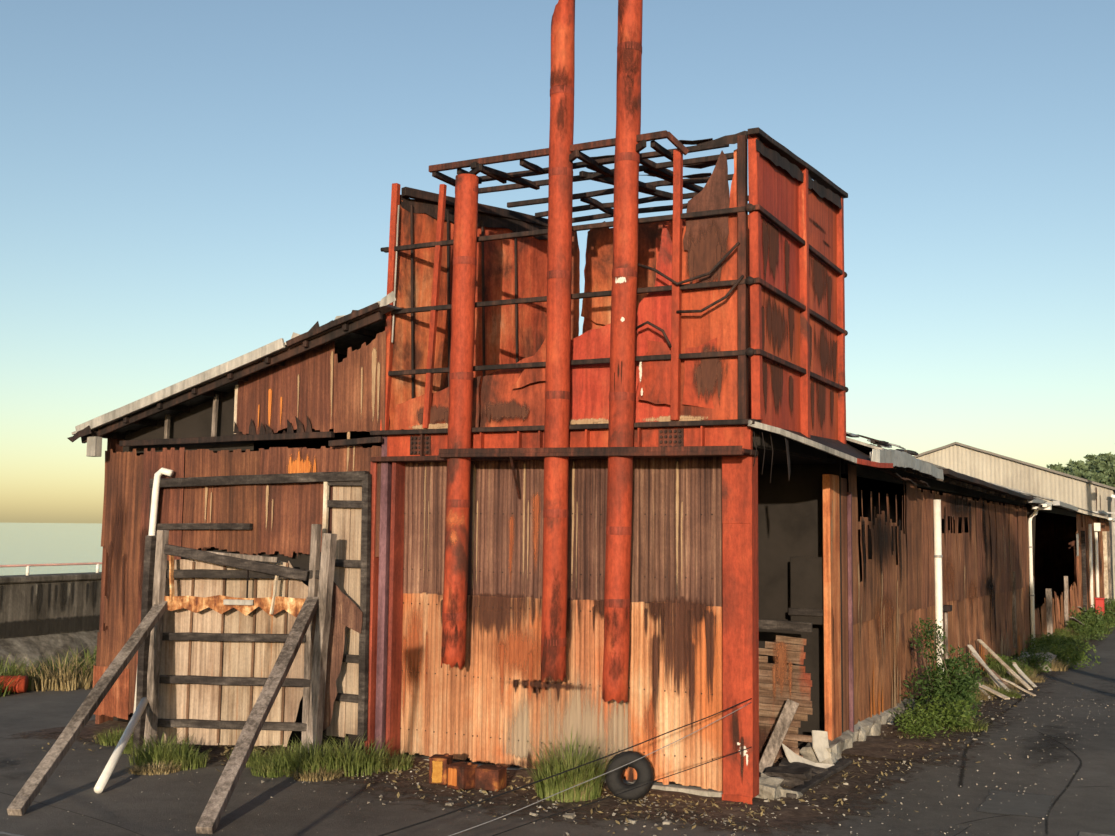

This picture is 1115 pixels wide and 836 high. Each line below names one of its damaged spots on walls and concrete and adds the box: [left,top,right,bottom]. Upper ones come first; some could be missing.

peeling [687,221,728,289]
rust [164,595,306,617]
rust [402,610,428,720]
rust [467,593,583,701]
rust [644,597,716,765]